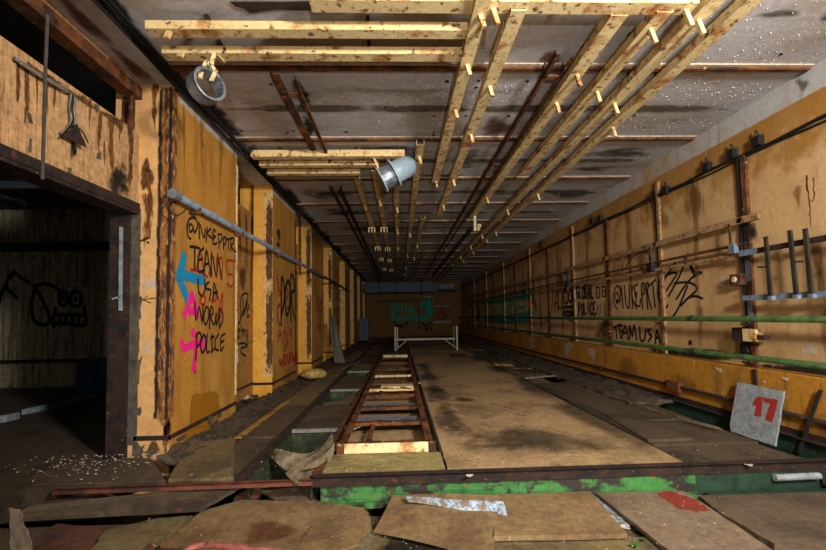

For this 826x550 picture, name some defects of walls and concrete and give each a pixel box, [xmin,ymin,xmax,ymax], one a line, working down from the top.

corrosion [61,0,105,38]
corrosion [16,62,67,124]
corrosion [116,52,159,126]
corrosion [75,93,154,237]
leakage [463,150,507,168]
leakage [577,148,644,171]
peeling [154,87,173,418]
spalling [133,214,142,428]
flaking render [132,442,159,458]